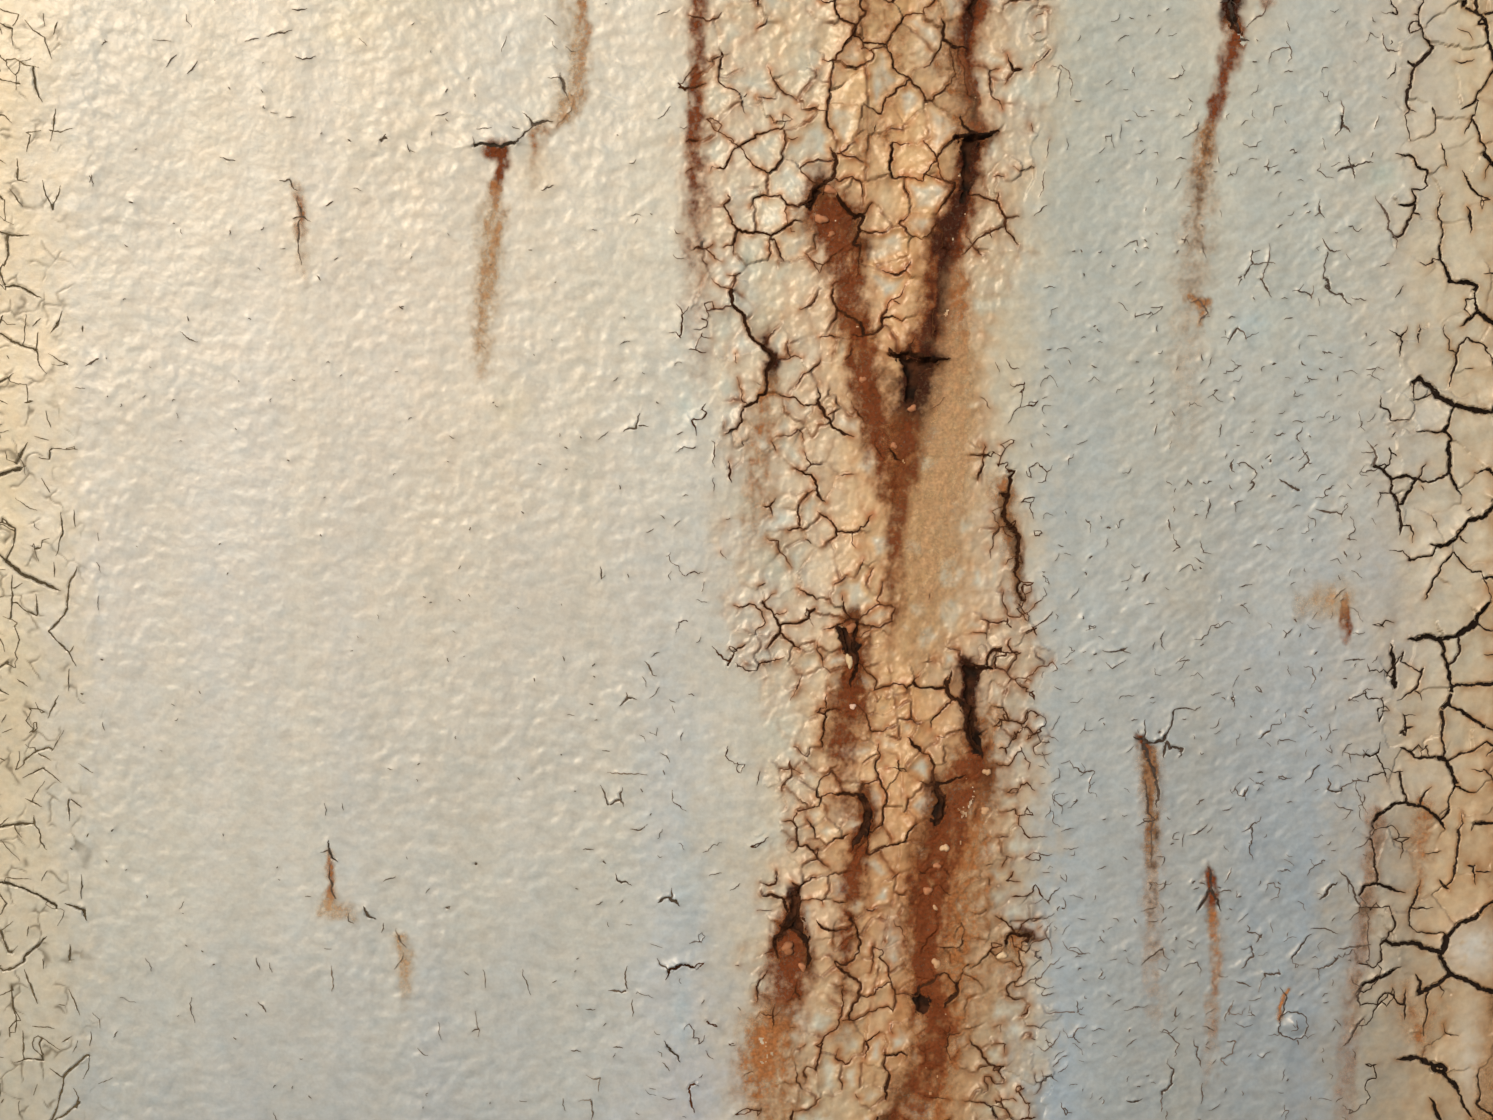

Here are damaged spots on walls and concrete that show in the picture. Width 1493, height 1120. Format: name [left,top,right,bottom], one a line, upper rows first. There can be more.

rust [477,140,509,351]
rust [558,0,591,125]
rust [685,0,710,250]
rust [804,0,992,643]
rust [1191,0,1246,248]
crack [0,0,215,1120]
crack [522,0,1493,1120]
crack [418,970,486,1056]
rust [739,885,815,1120]
rust [822,608,878,998]
rust [879,655,1036,1120]
rust [1136,734,1160,917]